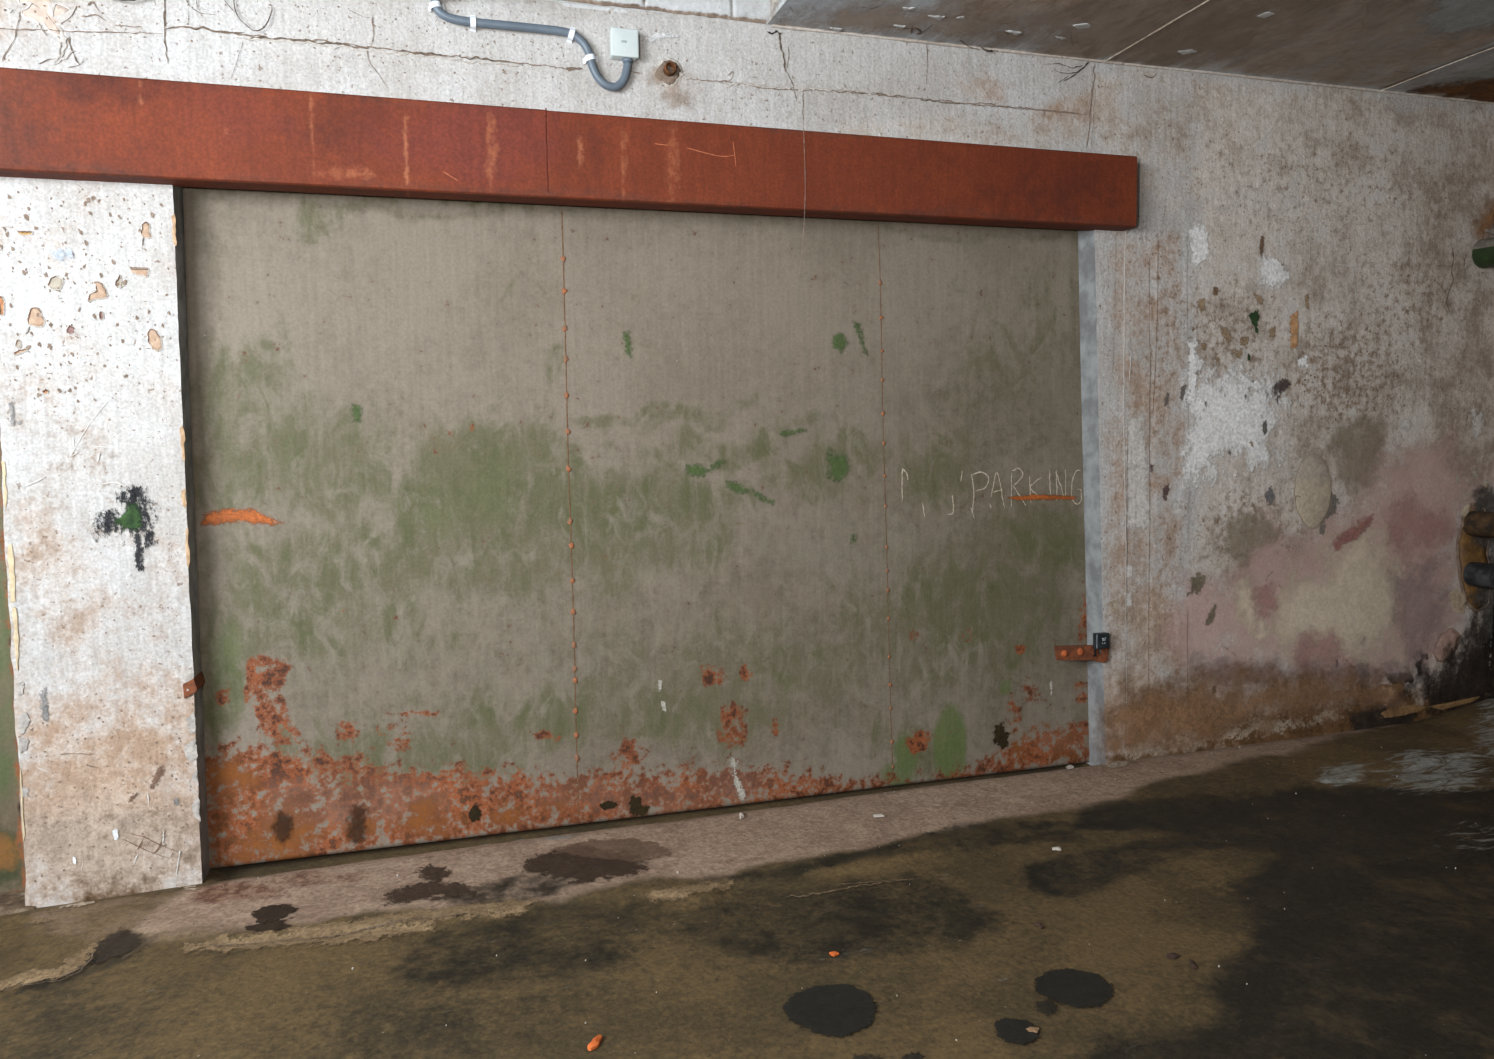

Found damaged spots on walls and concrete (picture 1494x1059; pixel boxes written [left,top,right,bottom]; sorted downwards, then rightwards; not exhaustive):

damp [832,0,1337,67]
damp [1456,470,1494,512]